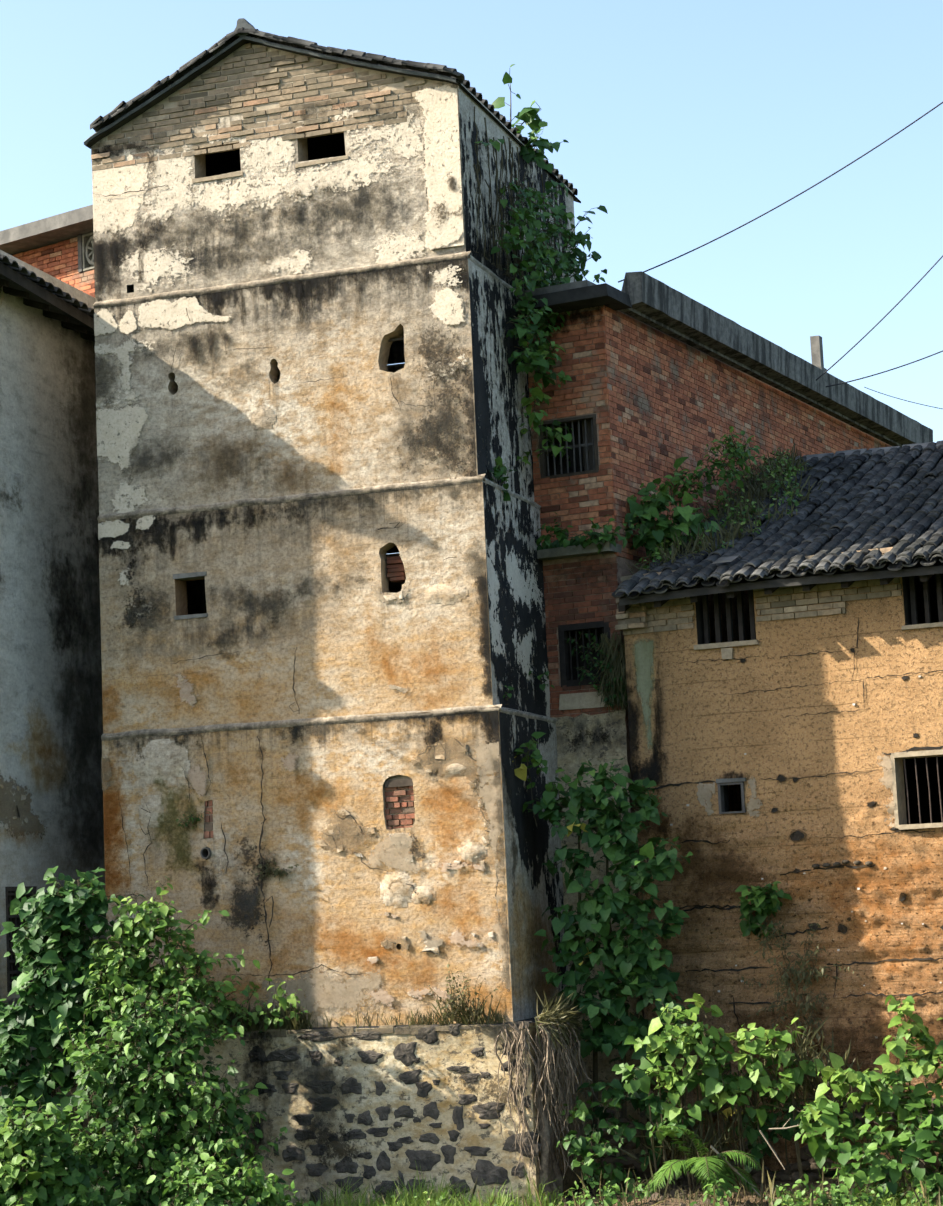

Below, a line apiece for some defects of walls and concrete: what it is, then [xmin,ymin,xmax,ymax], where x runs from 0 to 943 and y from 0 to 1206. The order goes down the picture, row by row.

leakage [94,223,159,302]
leakage [187,290,237,311]
peeling [92,85,467,549]
leakage [261,272,330,311]
leakage [99,506,265,554]
leakage [440,114,569,992]
crack [224,736,366,990]
flaking render [315,809,421,887]
crack [681,838,730,846]
crack [780,830,935,876]
crack [679,904,740,912]
crack [827,957,943,998]